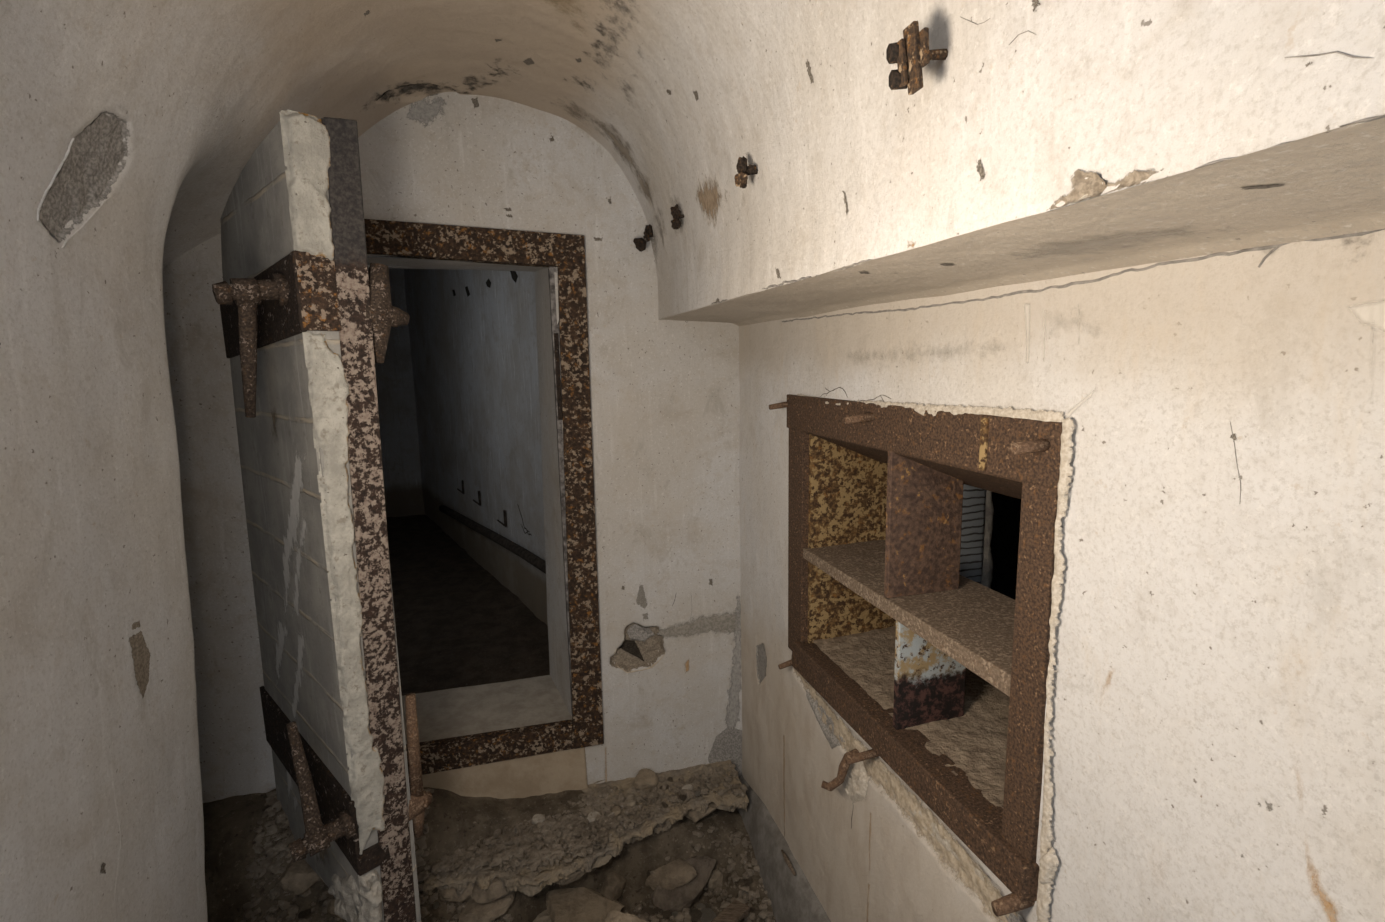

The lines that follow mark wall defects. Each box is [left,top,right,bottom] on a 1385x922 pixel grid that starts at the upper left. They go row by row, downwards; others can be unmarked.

flaking render [37,111,130,248]
spalling [610,585,666,673]
flaking render [794,394,1076,922]
rust [1310,869,1335,922]